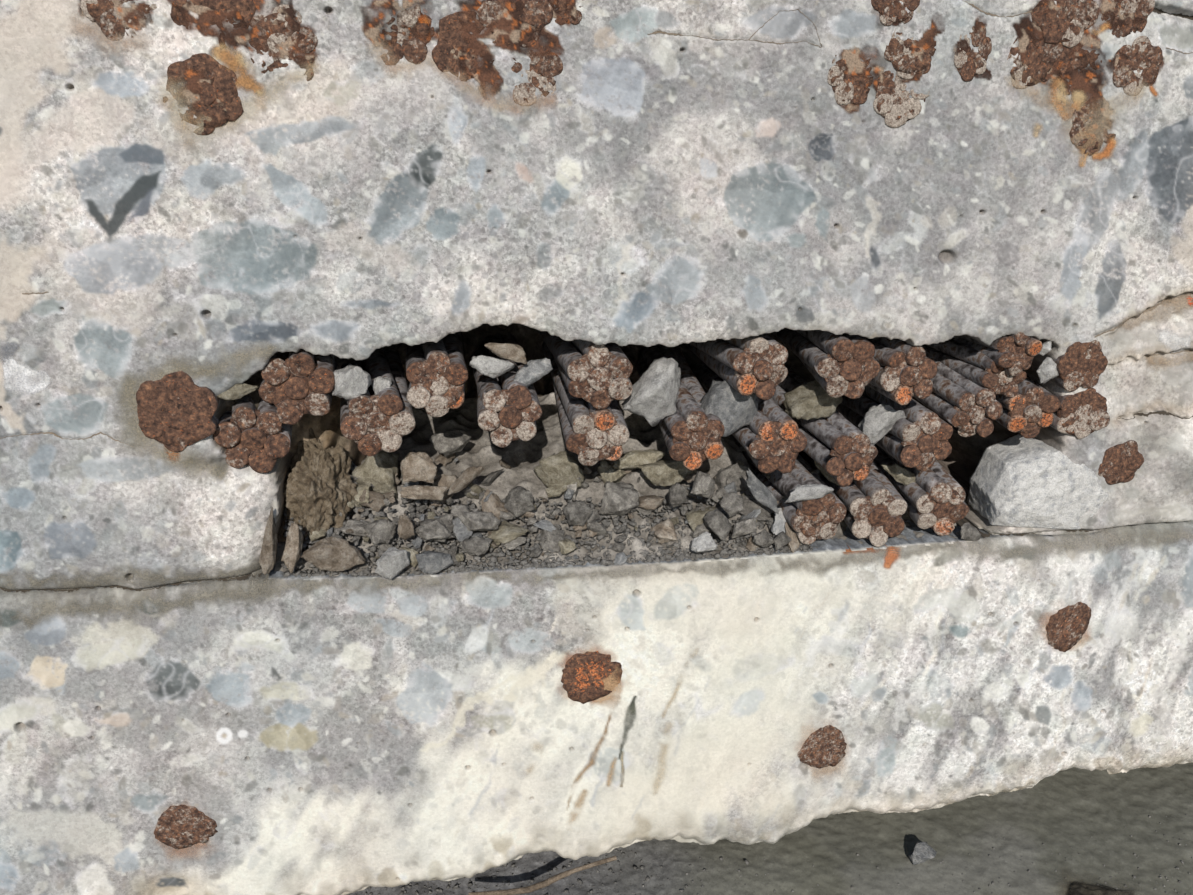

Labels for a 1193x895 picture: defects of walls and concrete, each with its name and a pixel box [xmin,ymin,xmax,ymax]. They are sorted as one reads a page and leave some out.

corrosion [167,0,317,95]
corrosion [450,0,576,97]
corrosion [901,19,944,82]
corrosion [954,19,992,80]
corrosion [1013,0,1164,166]
crack [1095,293,1193,337]
spalling [461,323,545,398]
spalling [619,344,644,386]
spalling [1022,336,1064,396]
crack [1118,411,1193,420]
spalling [272,396,366,543]
spalling [936,420,1019,533]